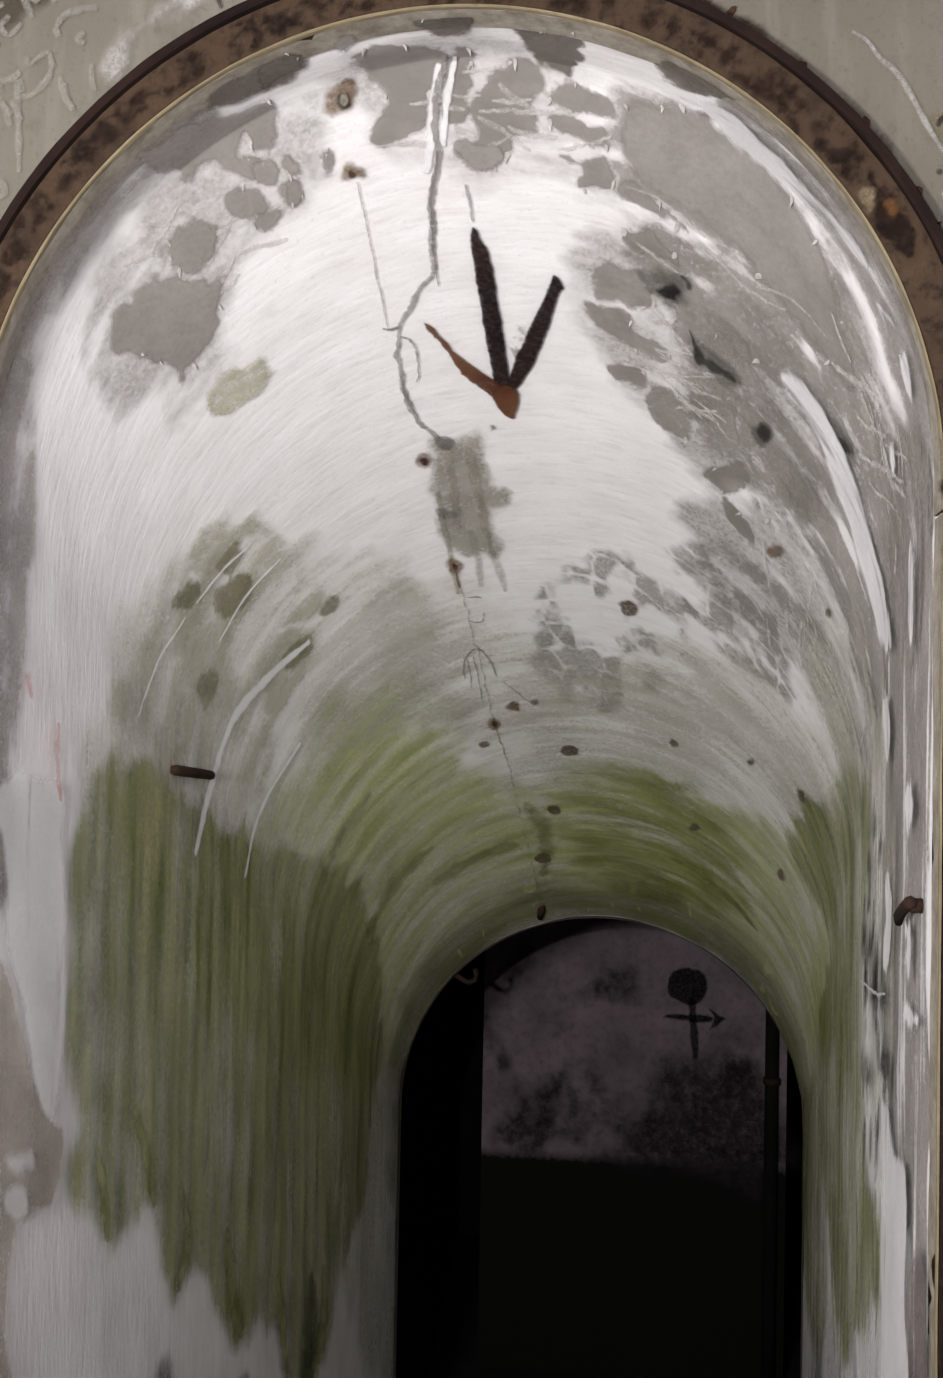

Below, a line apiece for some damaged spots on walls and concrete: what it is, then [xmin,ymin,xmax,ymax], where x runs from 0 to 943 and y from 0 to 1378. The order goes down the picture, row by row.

corrosion [699,0,765,36]
peeling [322,147,334,172]
crack [358,54,473,441]
peeling [0,53,307,787]
leakage [431,437,508,594]
peeling [0,829,8,901]
leakage [862,806,887,1165]